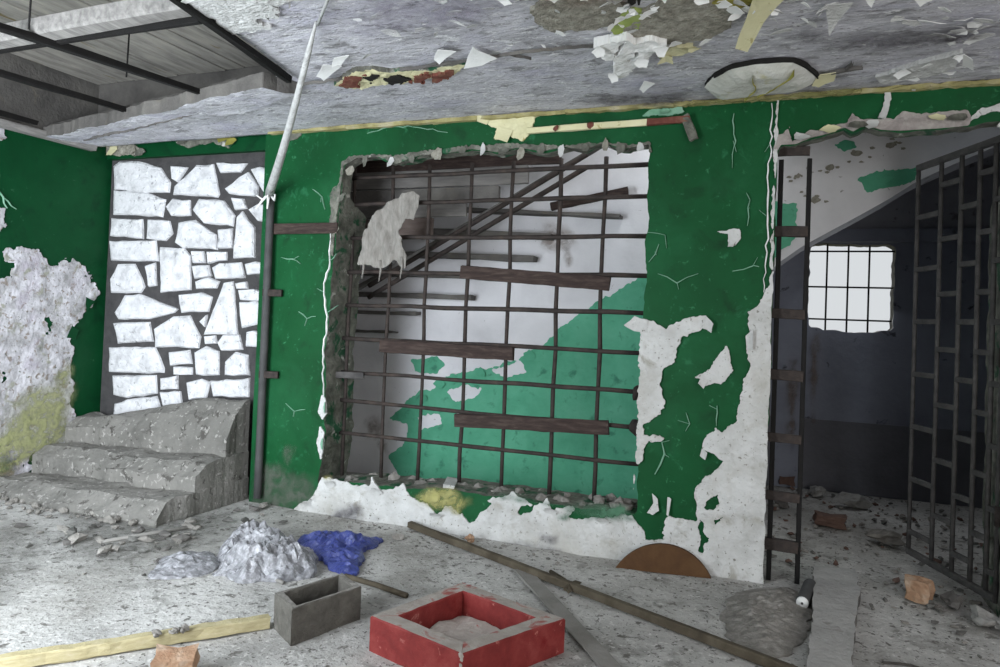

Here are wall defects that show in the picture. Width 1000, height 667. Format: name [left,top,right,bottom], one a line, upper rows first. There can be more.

flaking render [181,0,302,35]
spalling [175,137,237,148]
flaking render [0,246,100,477]
peeling [294,0,1000,584]